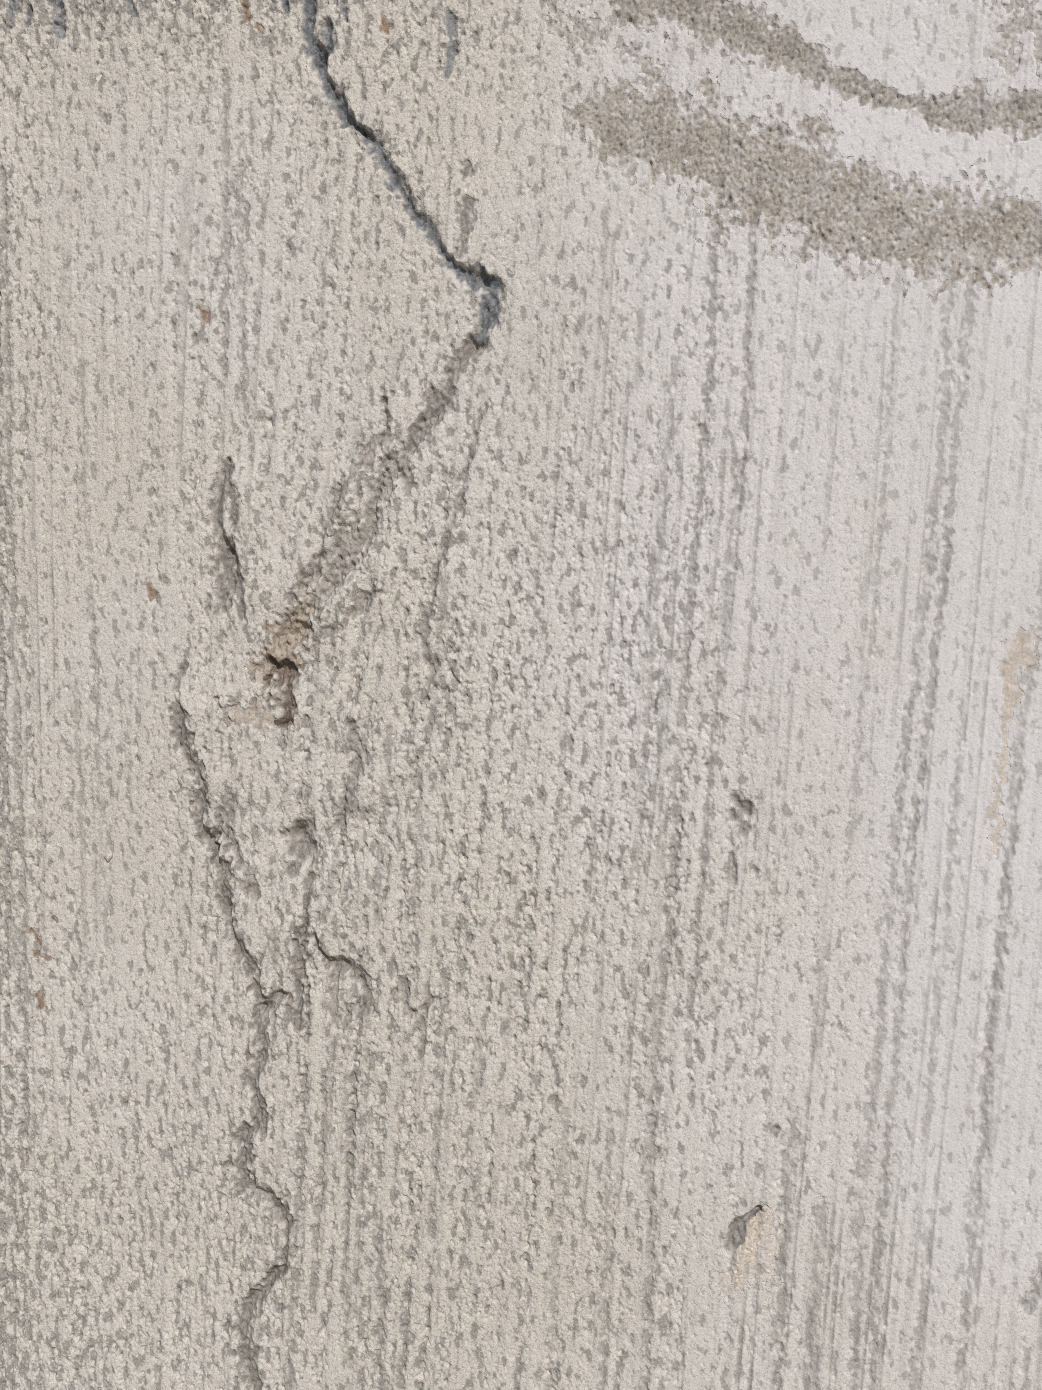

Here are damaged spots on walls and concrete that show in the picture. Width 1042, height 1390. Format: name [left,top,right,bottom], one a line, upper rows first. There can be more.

crack [199,457,256,632]
crack [282,0,515,704]
crack [167,656,446,1390]